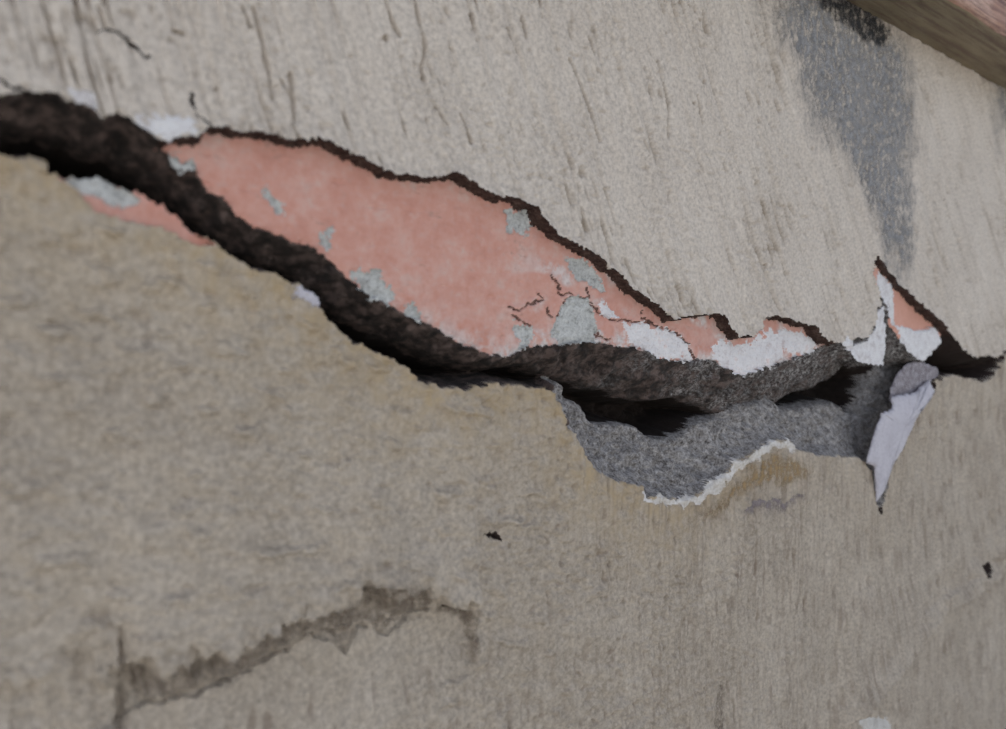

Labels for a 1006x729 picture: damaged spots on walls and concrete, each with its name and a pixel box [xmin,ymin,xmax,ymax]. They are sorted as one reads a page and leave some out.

peeling [59,176,215,246]
crack [0,78,1006,437]
peeling [134,110,952,515]
damp [783,0,913,269]
spalling [858,716,891,729]